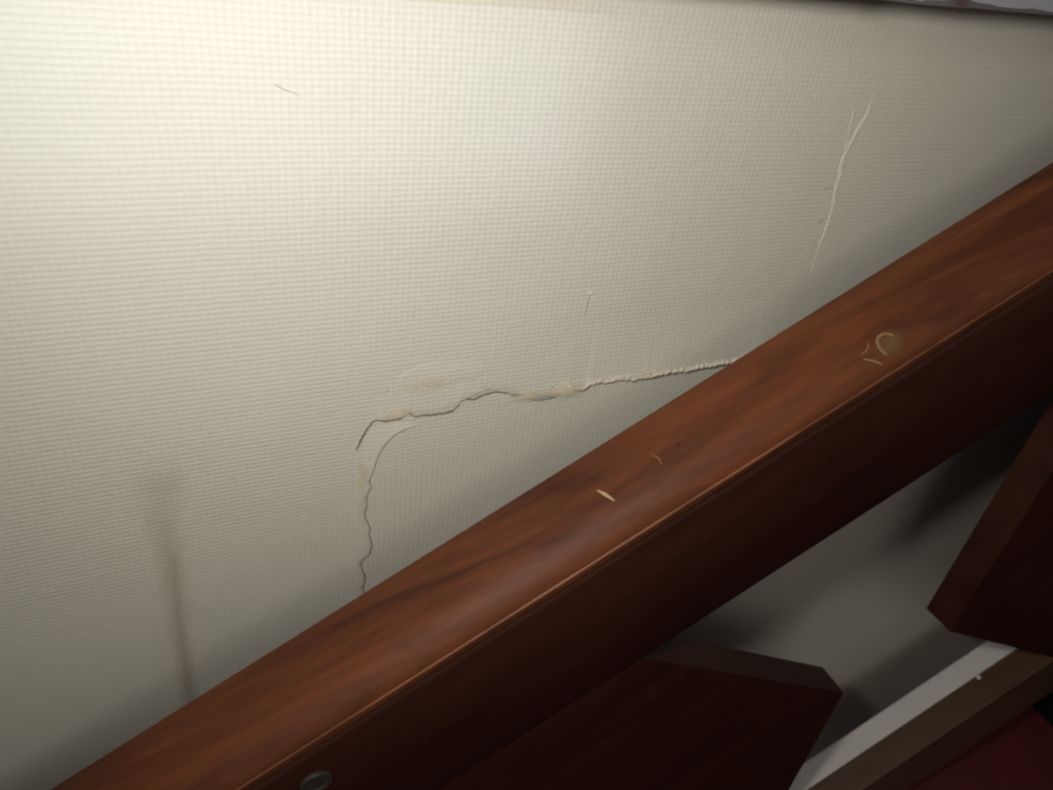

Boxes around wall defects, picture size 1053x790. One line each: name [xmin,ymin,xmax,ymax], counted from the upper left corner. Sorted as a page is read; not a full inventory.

crack [330,384,595,611]